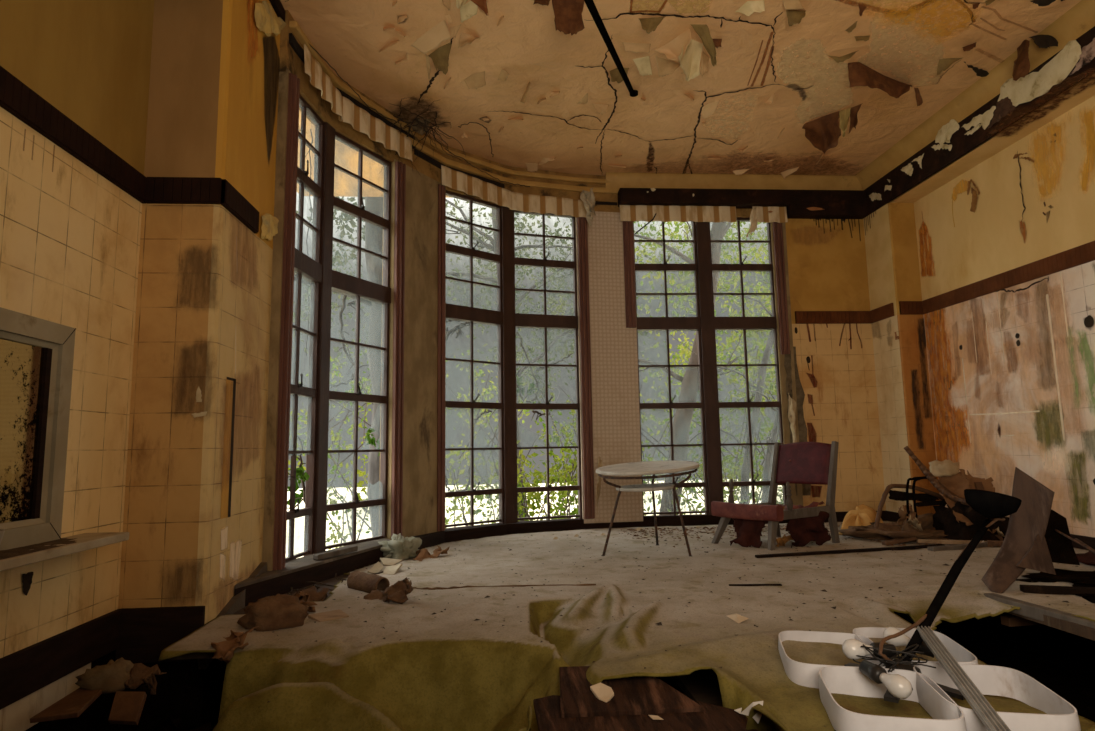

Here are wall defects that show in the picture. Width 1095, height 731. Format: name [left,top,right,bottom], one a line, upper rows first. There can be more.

spalling [254,1,286,36]
crack [417,70,441,105]
peeling [379,0,509,89]
peeling [534,0,585,36]
crack [488,12,787,174]
peeling [609,0,722,83]
peeling [736,0,765,16]
flaking render [777,0,926,165]
peeling [901,35,1082,176]
damp [1030,107,1095,199]
damp [953,271,1095,472]